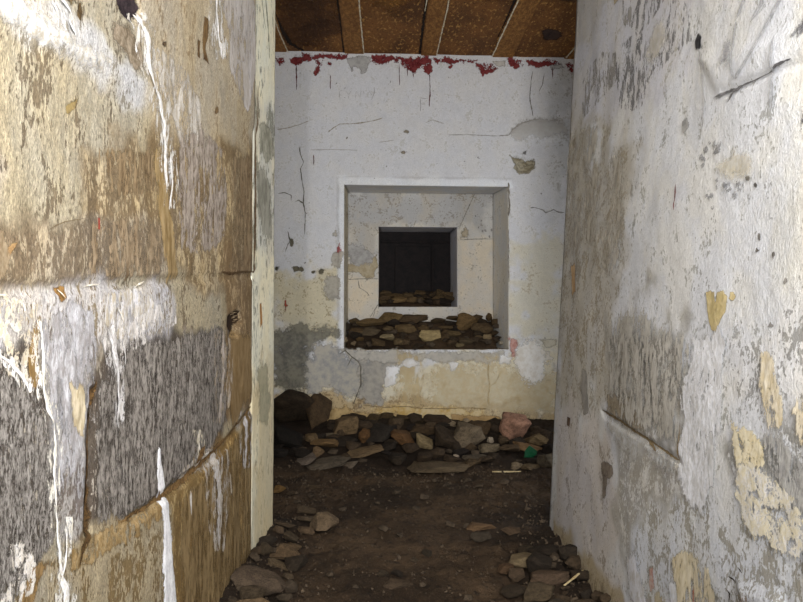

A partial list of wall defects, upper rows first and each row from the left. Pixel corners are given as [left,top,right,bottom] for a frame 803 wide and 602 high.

spalling [113,0,143,72]
peeling [275,52,573,77]
crack [715,58,791,101]
crack [222,98,258,281]
crack [278,118,382,252]
spalling [509,151,535,174]
crack [340,349,501,409]
crack [121,406,251,522]
damp [156,322,485,602]
crack [602,410,680,460]
peeling [763,431,803,515]